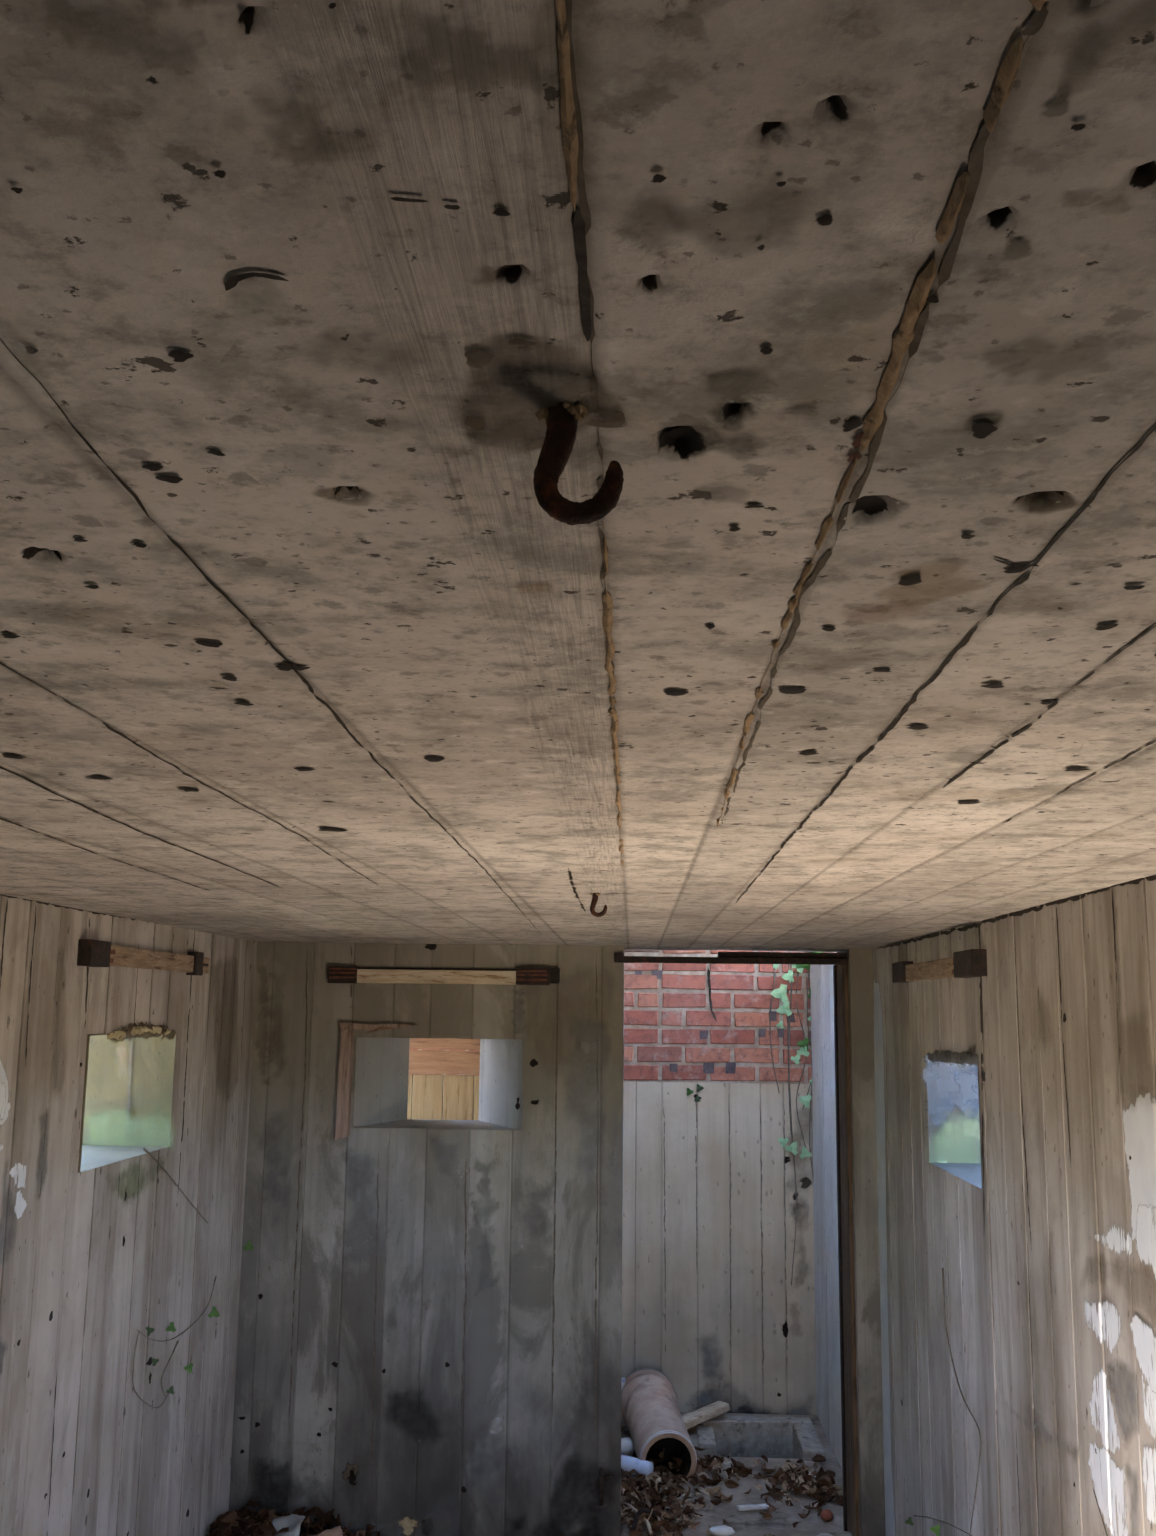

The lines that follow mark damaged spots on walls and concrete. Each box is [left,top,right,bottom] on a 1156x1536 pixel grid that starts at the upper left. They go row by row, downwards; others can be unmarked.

crack [736,425,1156,903]
crack [568,868,618,912]
peeling [0,1058,11,1125]
peeling [0,1144,27,1219]
peeling [1094,1092,1156,1278]
damp [388,1393,440,1441]
peeling [1084,1300,1156,1536]
damp [536,1461,621,1536]